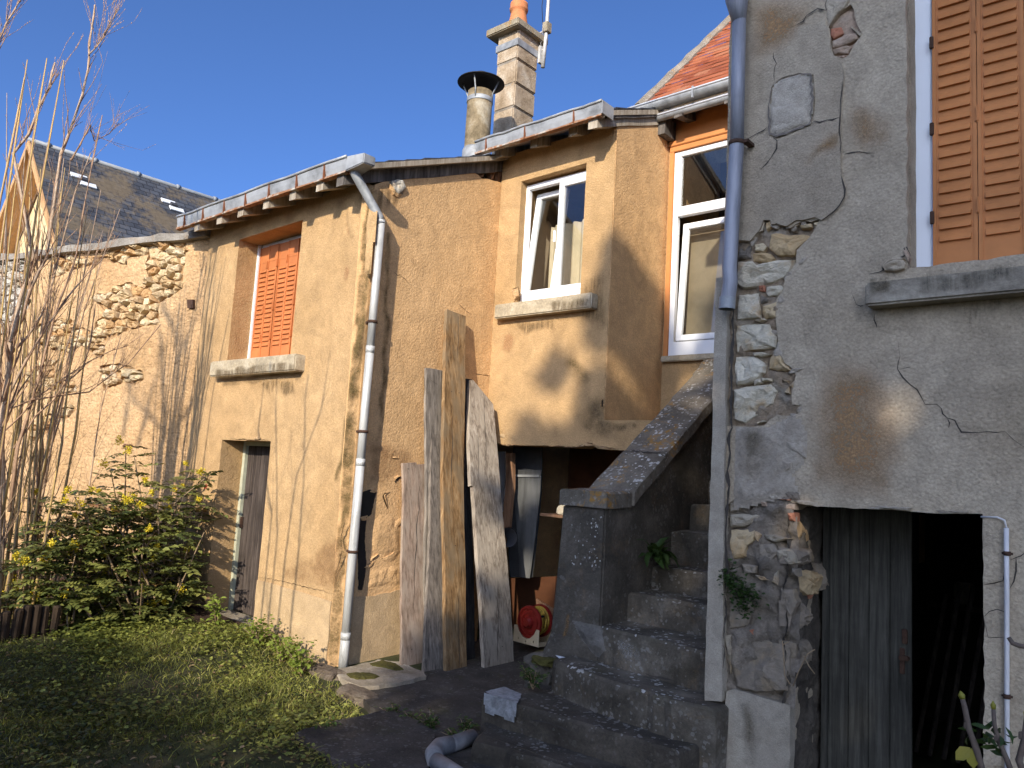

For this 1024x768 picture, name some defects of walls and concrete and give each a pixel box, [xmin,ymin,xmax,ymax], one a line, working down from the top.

spalling [826,0,862,59]
crack [811,76,868,219]
spalling [25,242,189,439]
spalling [718,118,845,709]
leakage [825,379,885,480]
crack [897,345,1024,447]